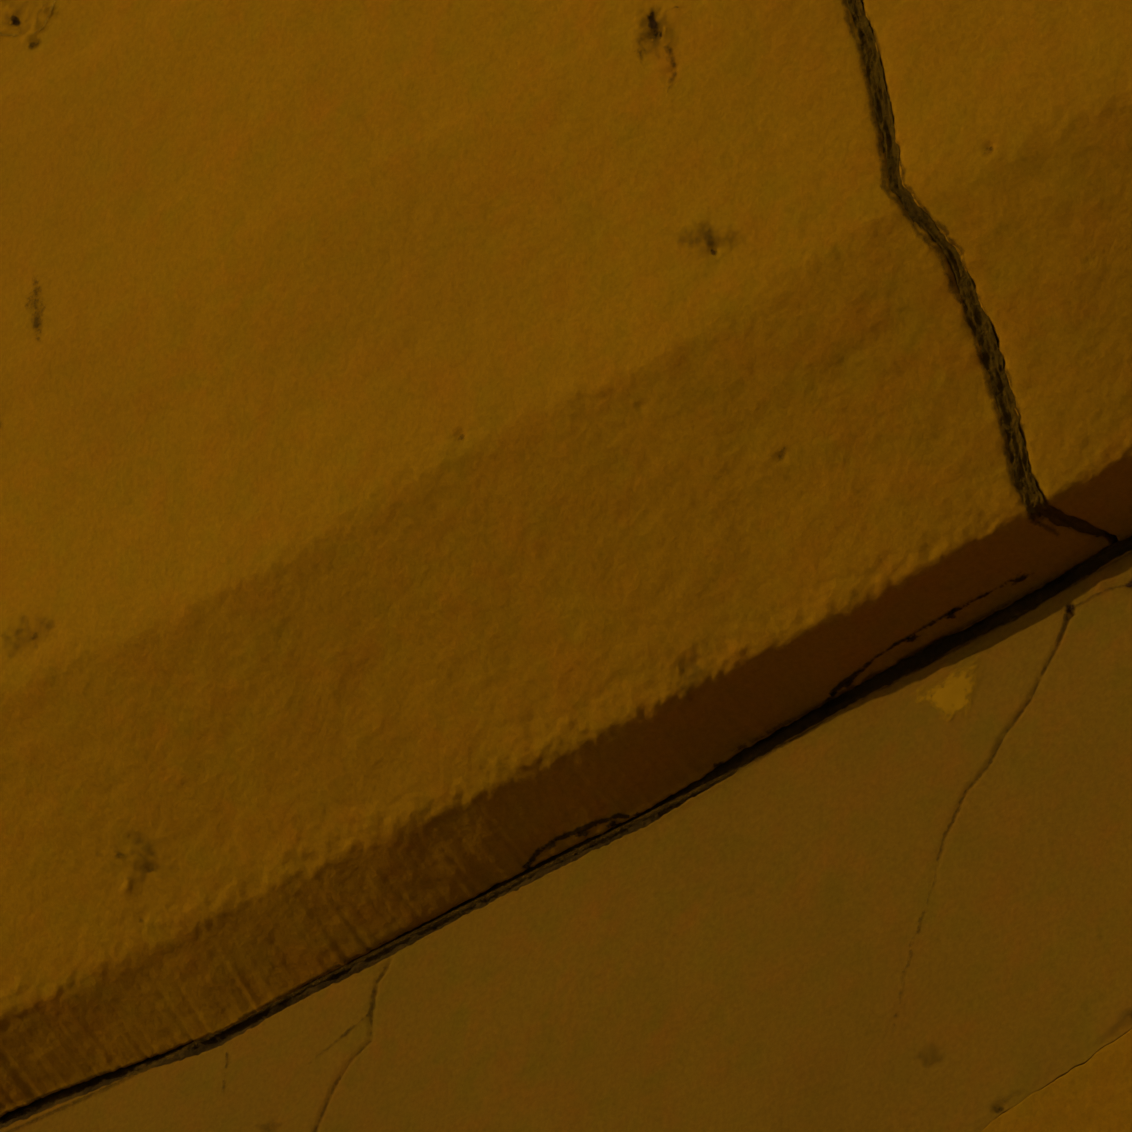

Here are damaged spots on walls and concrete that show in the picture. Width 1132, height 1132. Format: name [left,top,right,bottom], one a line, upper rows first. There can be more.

crack [842,0,1108,537]
crack [0,536,1132,1132]